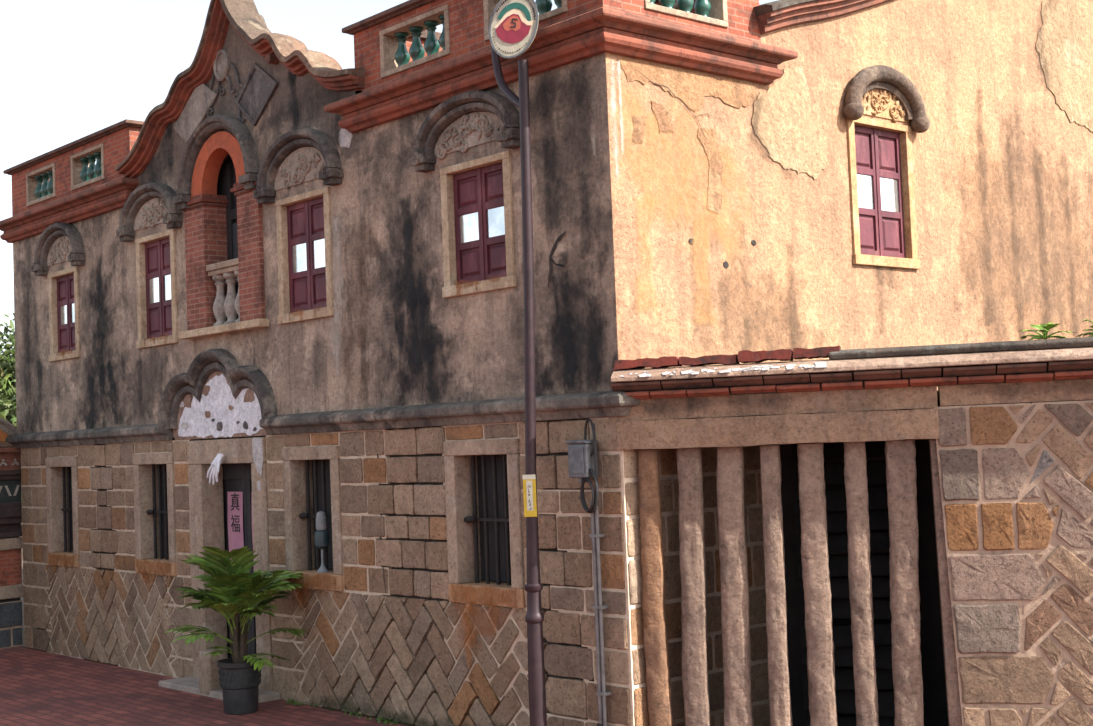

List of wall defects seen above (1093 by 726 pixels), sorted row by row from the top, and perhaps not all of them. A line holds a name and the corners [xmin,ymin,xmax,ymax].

crack [638,71,722,139]
peeling [697,127,723,214]
spalling [617,58,829,179]
spalling [1035,0,1093,132]
leakage [82,259,123,429]
leakage [395,197,450,401]
leakage [540,254,616,391]
peeling [178,374,263,491]